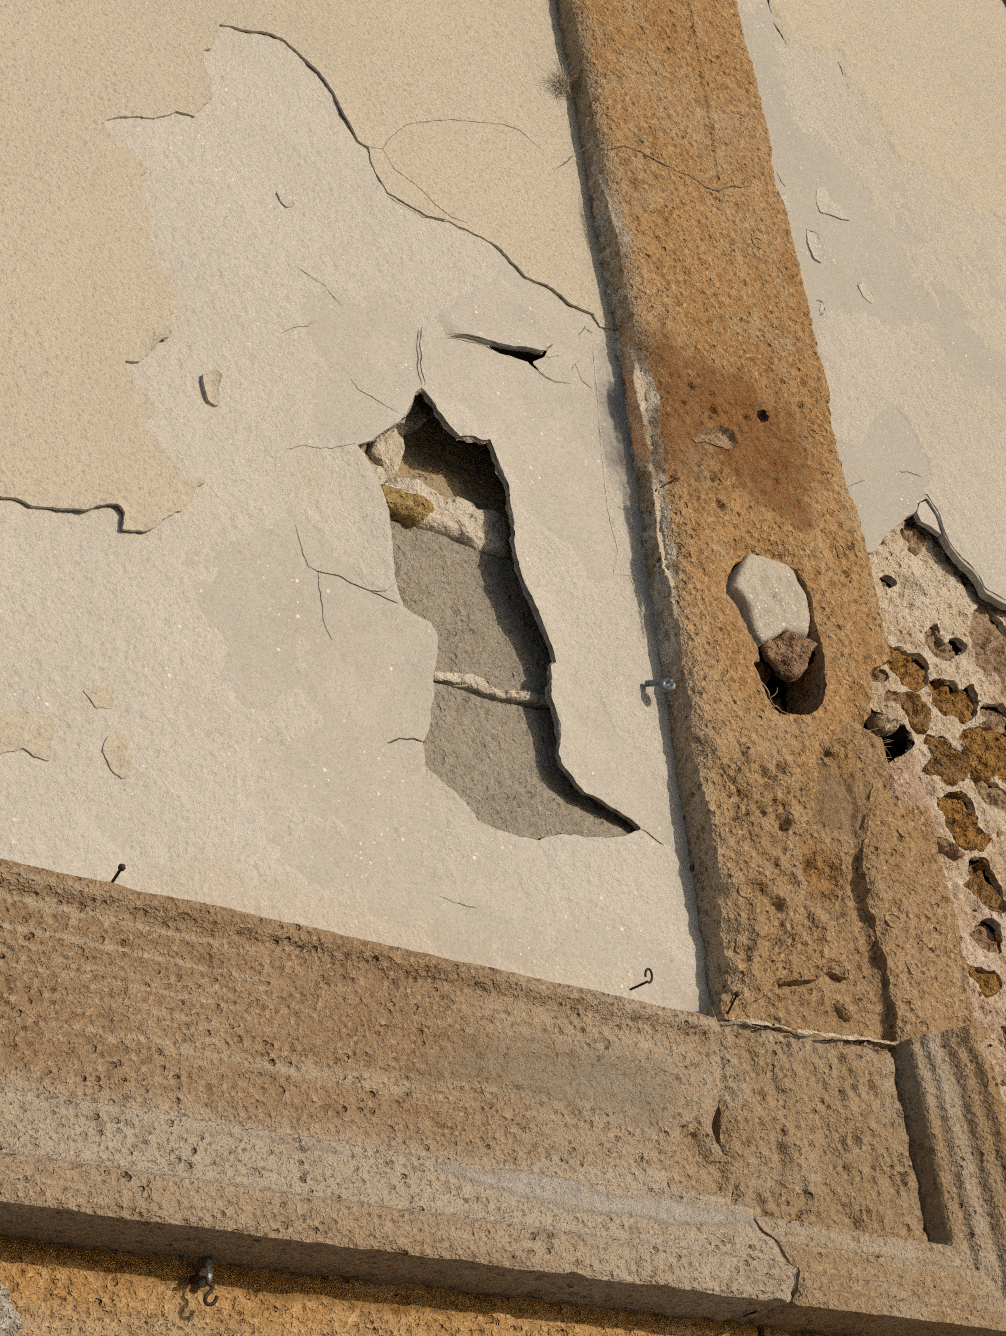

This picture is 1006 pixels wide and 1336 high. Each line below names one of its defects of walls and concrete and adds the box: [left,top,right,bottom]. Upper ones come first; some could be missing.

crack [369,119,541,223]
peeling [737,0,1006,366]
spalling [692,425,738,450]
peeling [0,26,711,1007]
crack [295,525,397,639]
spalling [720,283,1006,1109]
crack [754,1219,800,1295]